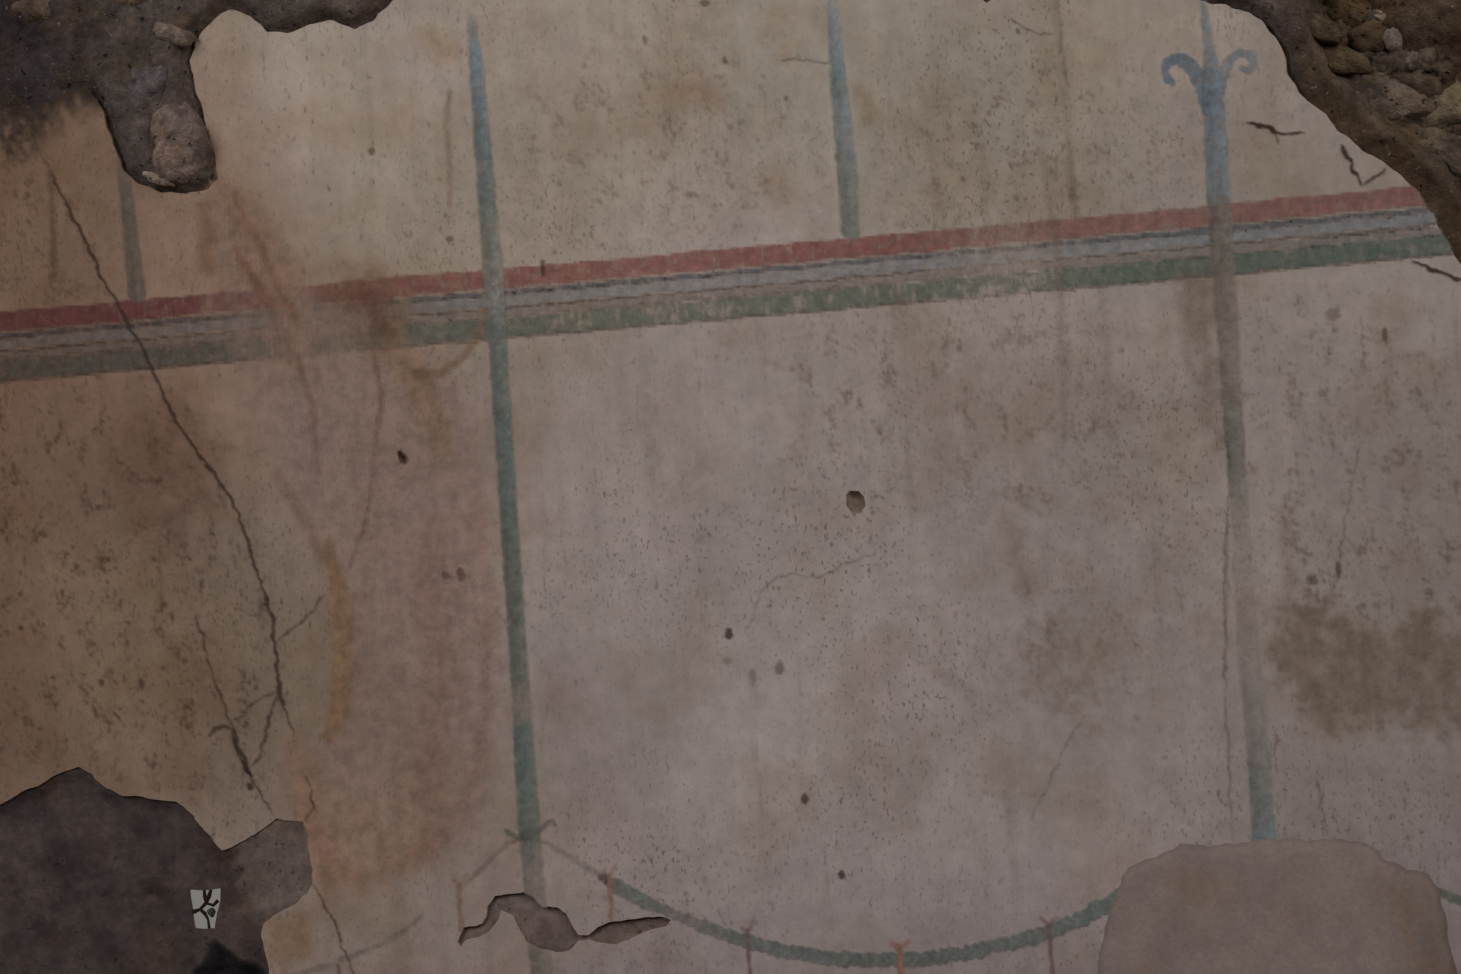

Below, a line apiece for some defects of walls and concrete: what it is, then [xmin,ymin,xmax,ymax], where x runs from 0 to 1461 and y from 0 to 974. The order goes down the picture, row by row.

spalling [0,0,393,194]
spalling [1201,0,1461,264]
crack [52,175,290,804]
spalling [0,767,313,974]
spalling [458,892,671,952]